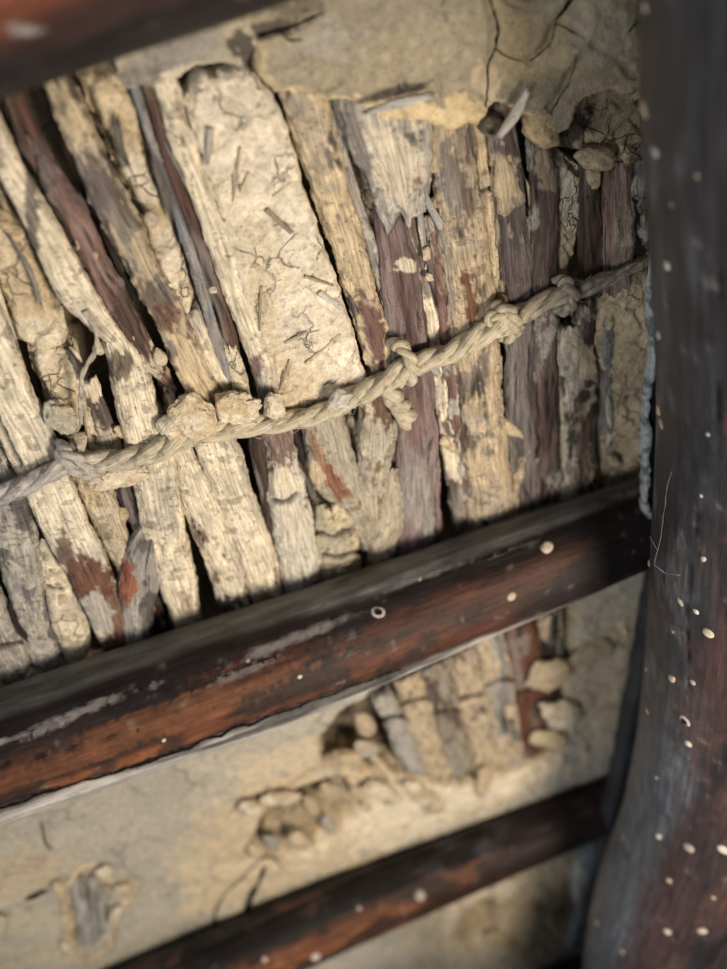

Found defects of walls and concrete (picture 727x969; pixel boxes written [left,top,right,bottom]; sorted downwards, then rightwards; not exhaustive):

crack [258,13,324,42]
crack [485,0,583,114]
spalling [223,616,631,872]
crack [26,890,49,901]
spalling [52,861,140,965]
crack [213,855,283,924]